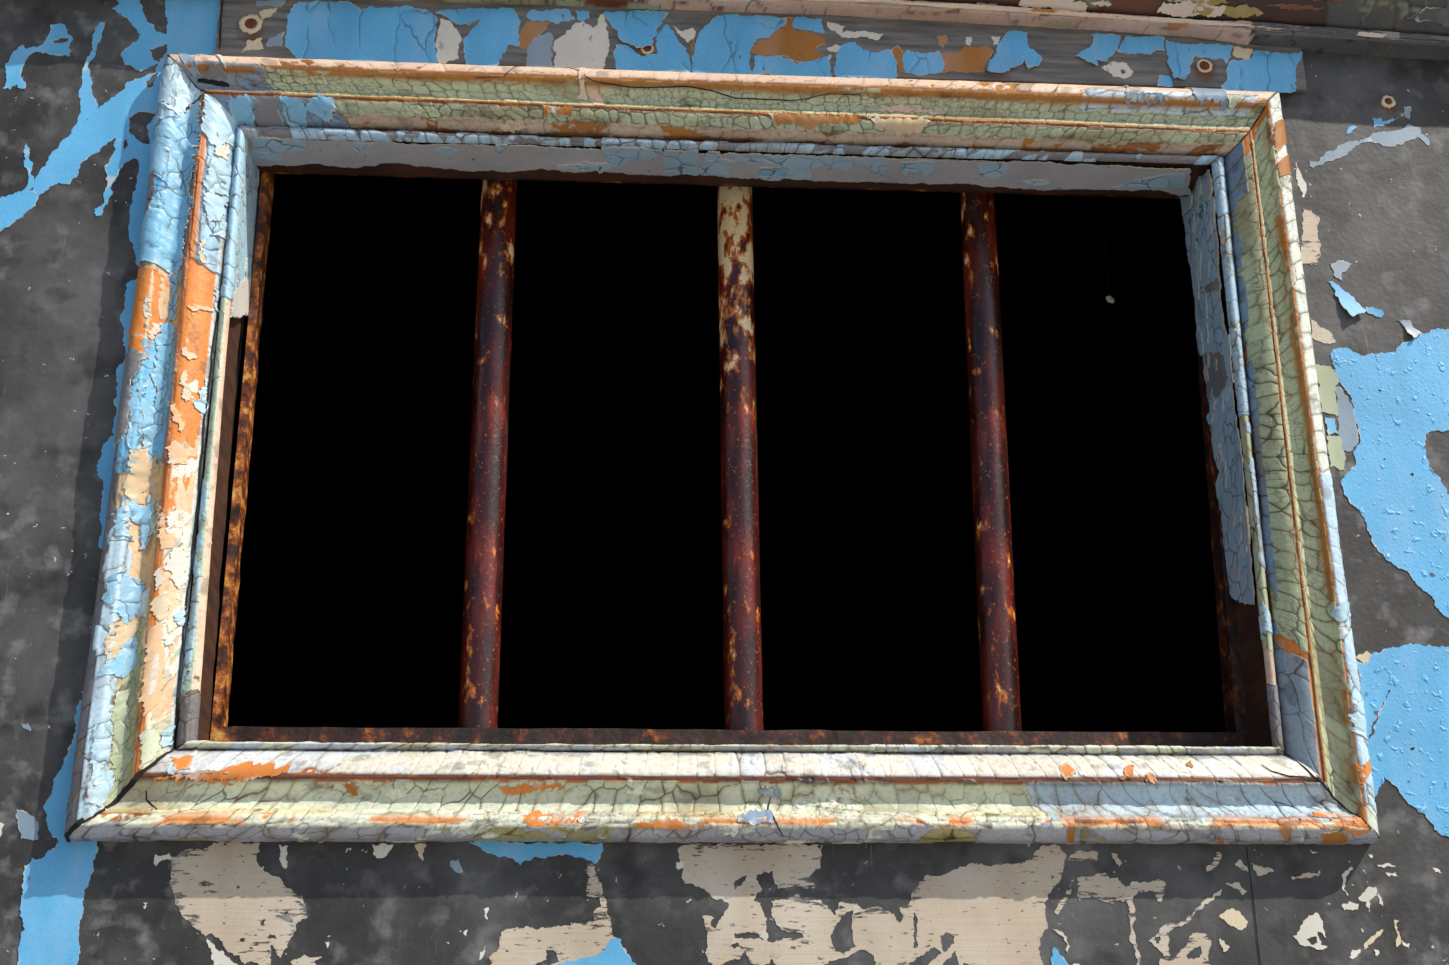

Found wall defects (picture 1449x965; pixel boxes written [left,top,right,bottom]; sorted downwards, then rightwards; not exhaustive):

peeling [808,0,1449,111]
peeling [0,0,1255,806]
peeling [1274,106,1449,618]
crack [64,274,223,842]
peeling [1348,643,1449,837]
peeling [0,700,99,965]
peeling [154,841,329,965]
peeling [470,810,636,965]
peeling [634,816,1274,965]
peeling [1293,913,1328,950]
peeling [1342,854,1397,913]
peeling [1350,920,1410,959]